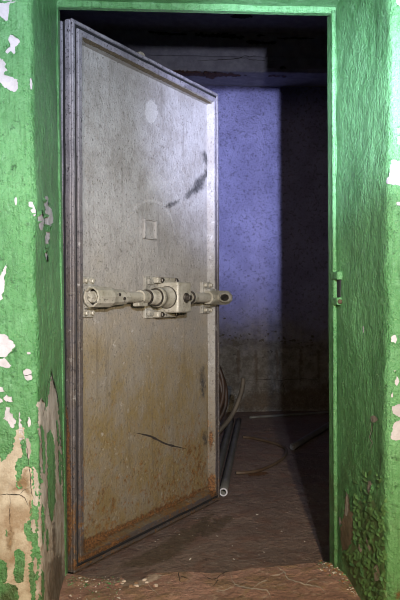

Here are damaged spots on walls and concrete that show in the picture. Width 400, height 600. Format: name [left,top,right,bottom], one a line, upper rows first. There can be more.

peeling [0,0,15,22]
peeling [0,34,20,92]
peeling [386,158,400,187]
peeling [28,196,53,262]
peeling [0,334,16,368]
peeling [22,368,33,383]
peeling [391,369,400,441]
crack [1,443,32,519]
peeling [0,376,65,600]
peeling [339,488,353,551]